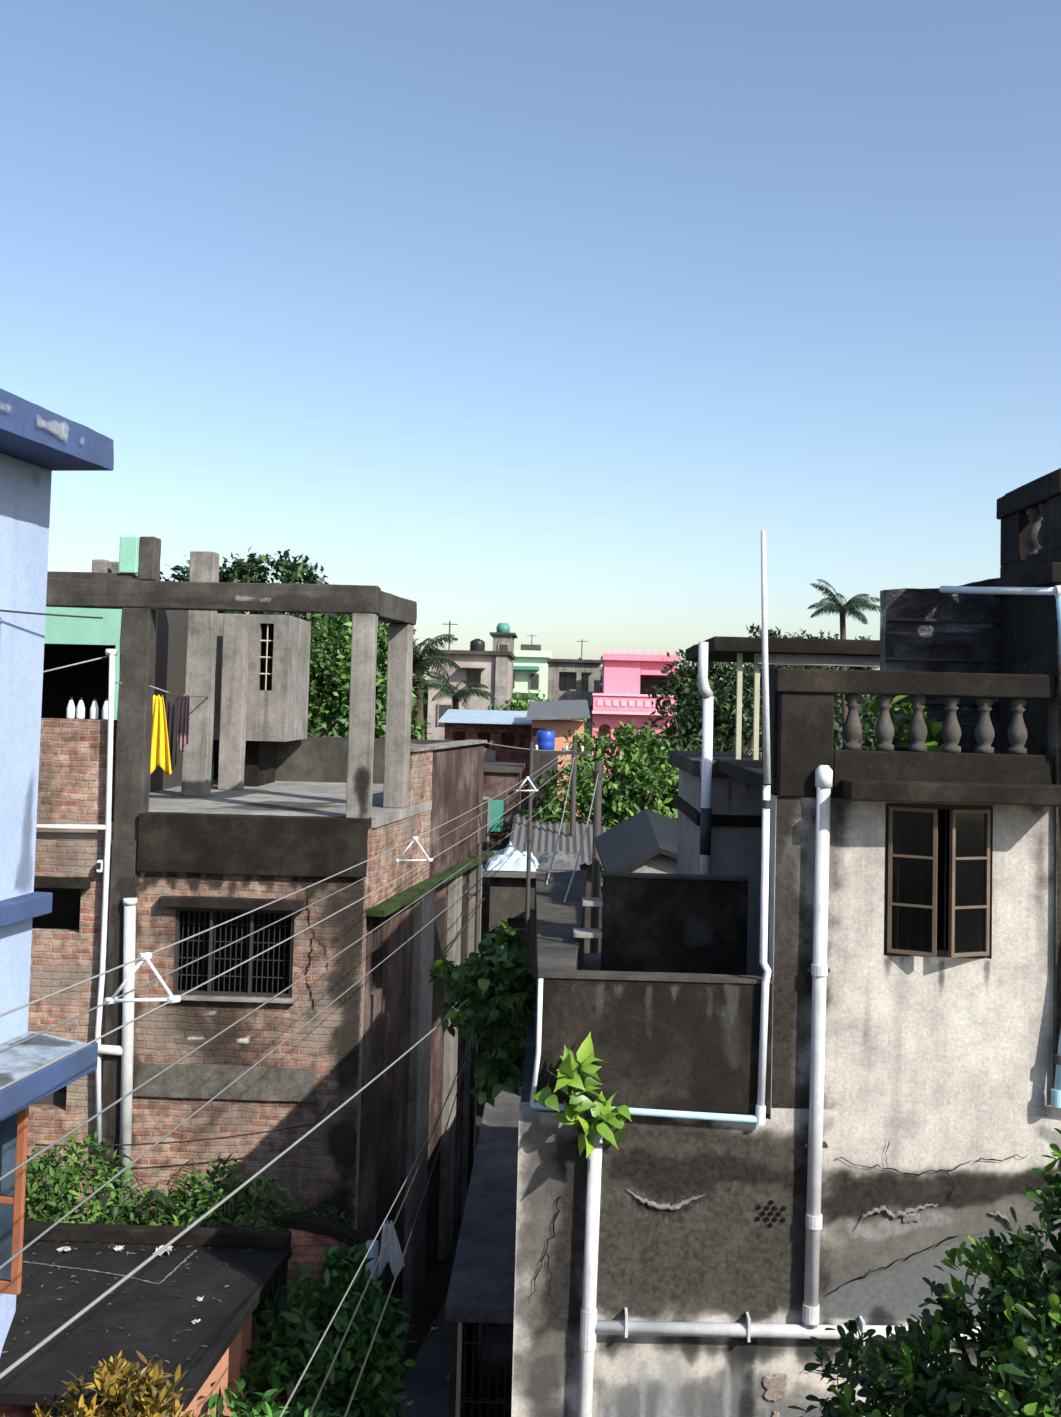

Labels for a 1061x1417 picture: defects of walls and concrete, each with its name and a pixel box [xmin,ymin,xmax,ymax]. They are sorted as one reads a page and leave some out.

crack [305,897,328,1012]
water stain [516,797,1061,1417]
crack [528,1196,562,1302]
crack [825,1140,1028,1297]